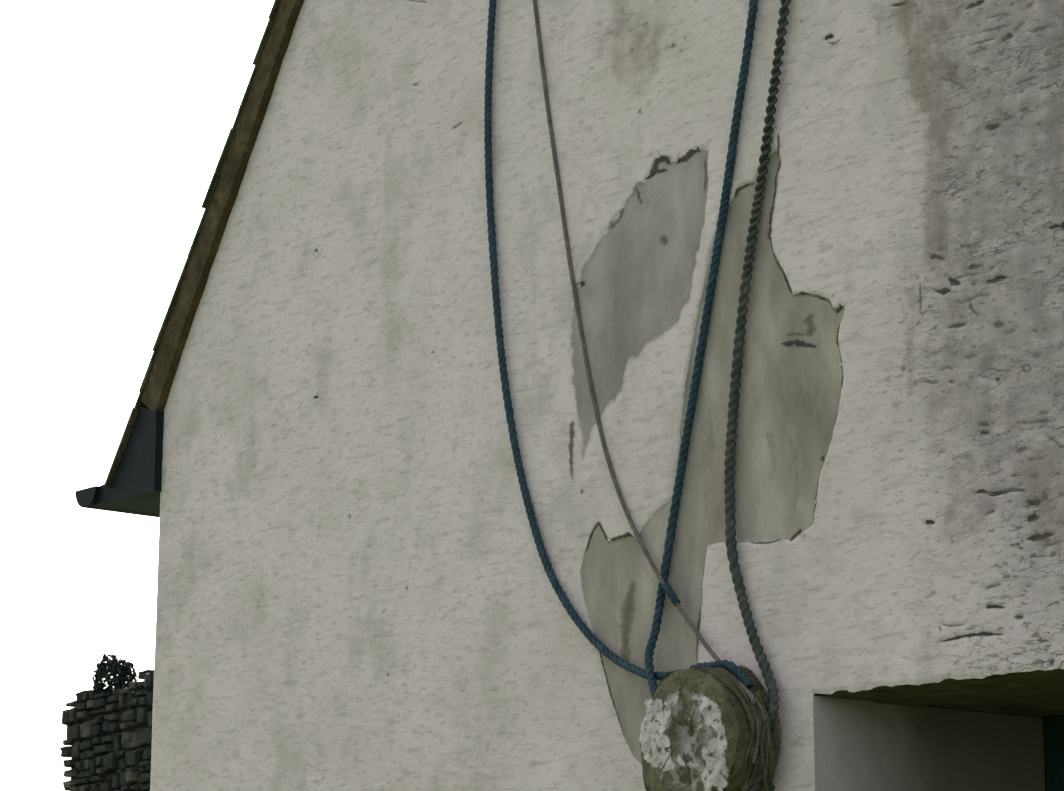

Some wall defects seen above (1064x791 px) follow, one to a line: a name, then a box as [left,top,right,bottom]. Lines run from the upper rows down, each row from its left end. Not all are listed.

flaking render [571,146,845,764]